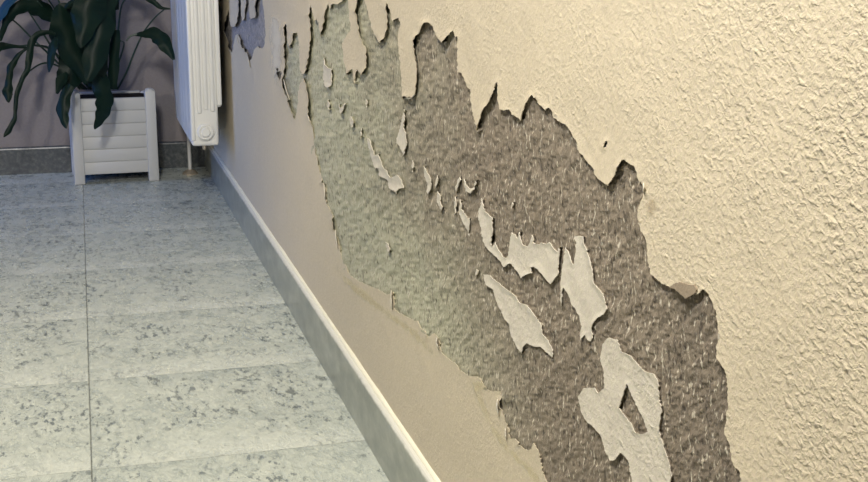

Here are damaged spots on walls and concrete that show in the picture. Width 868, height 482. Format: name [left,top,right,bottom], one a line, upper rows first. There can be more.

peeling [224,0,266,67]
peeling [276,0,741,482]